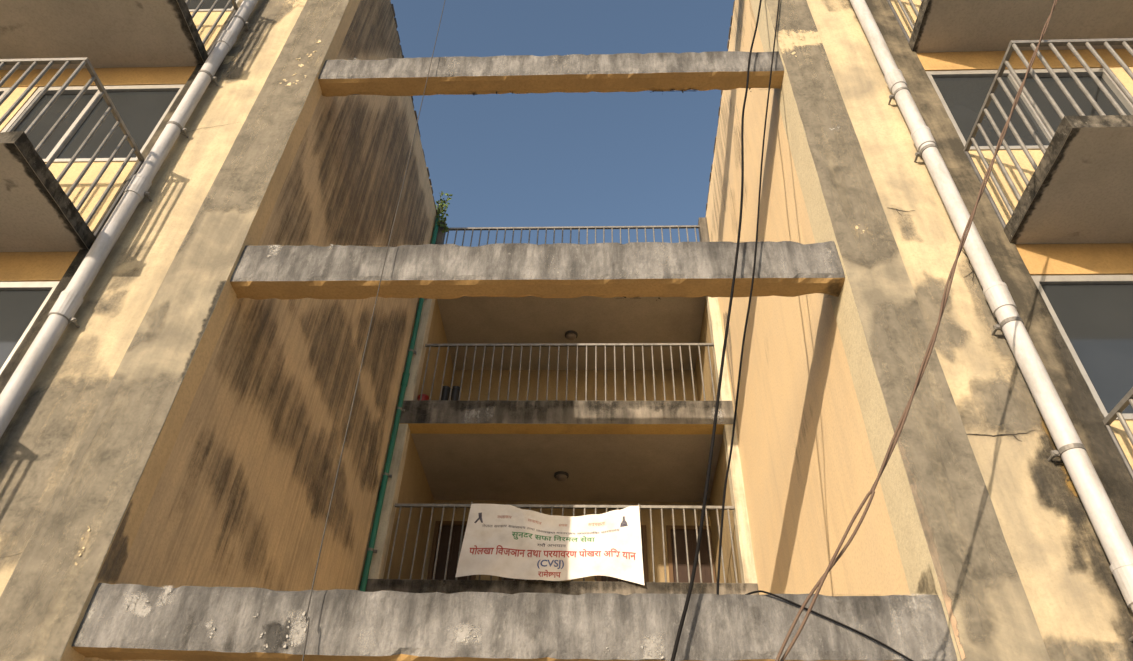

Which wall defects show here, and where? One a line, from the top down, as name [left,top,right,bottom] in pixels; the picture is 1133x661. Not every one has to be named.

damp [169,0,210,112]
damp [198,0,401,213]
damp [315,100,428,246]
damp [775,0,912,267]
damp [912,0,932,52]
damp [0,281,226,661]
damp [228,302,406,544]
crack [967,430,1035,441]
damp [871,268,1133,661]
peeling [126,586,173,617]
spalling [253,611,308,652]